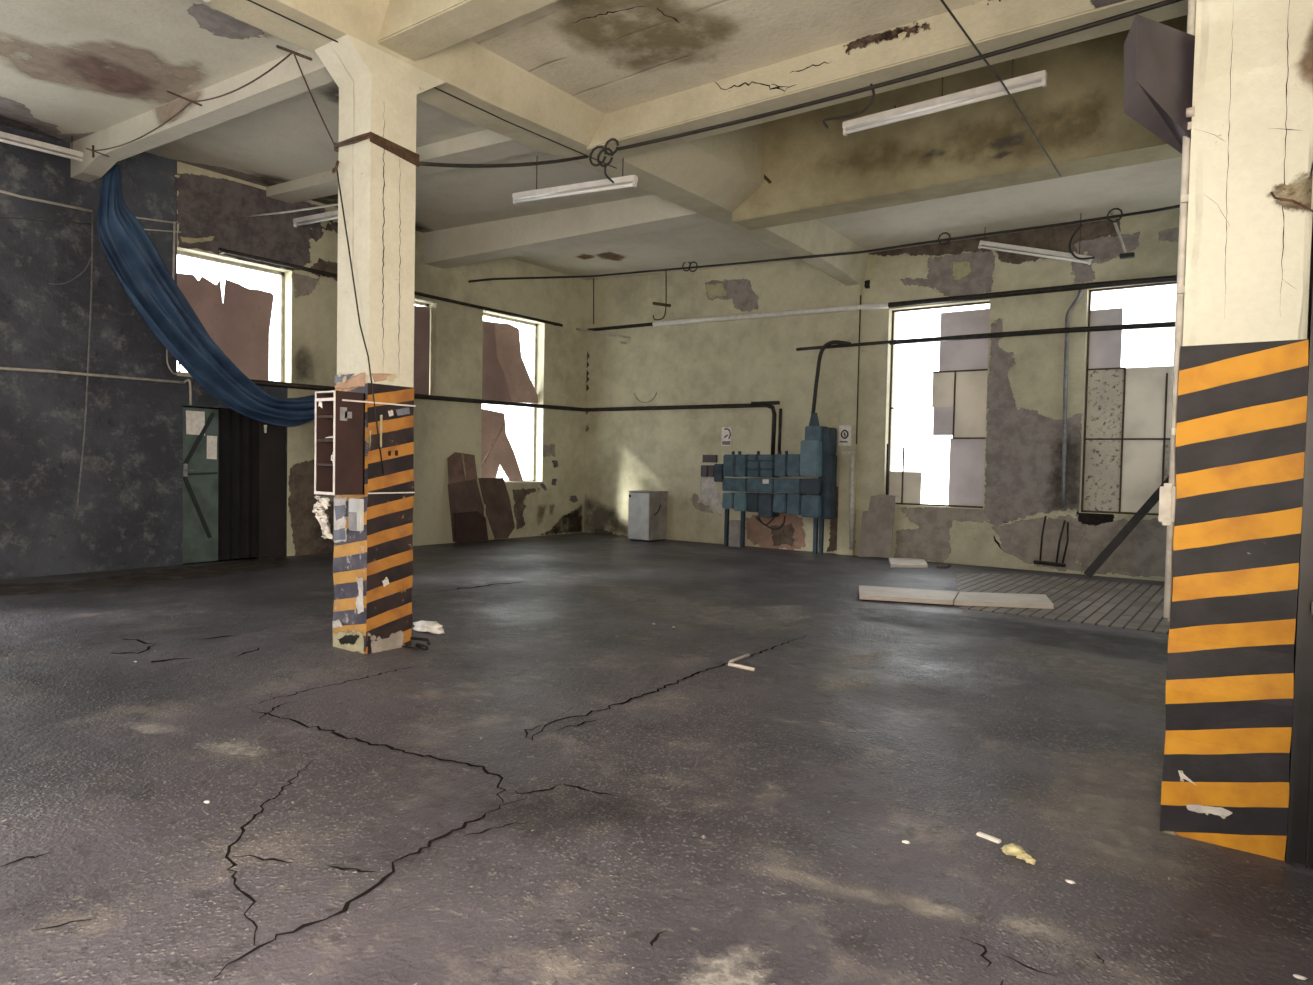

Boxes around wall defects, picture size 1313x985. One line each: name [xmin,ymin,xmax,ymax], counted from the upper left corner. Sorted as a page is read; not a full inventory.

peeling [187,3,268,40]
spalling [843,22,930,55]
peeling [1090,0,1125,9]
damp [0,39,201,123]
spalling [1270,163,1313,212]
peeling [705,279,759,312]
peeling [894,318,1173,577]
peeling [288,459,347,556]
crack [524,635,807,740]
crack [214,666,611,978]
crack [0,852,54,867]
crack [960,937,1056,985]